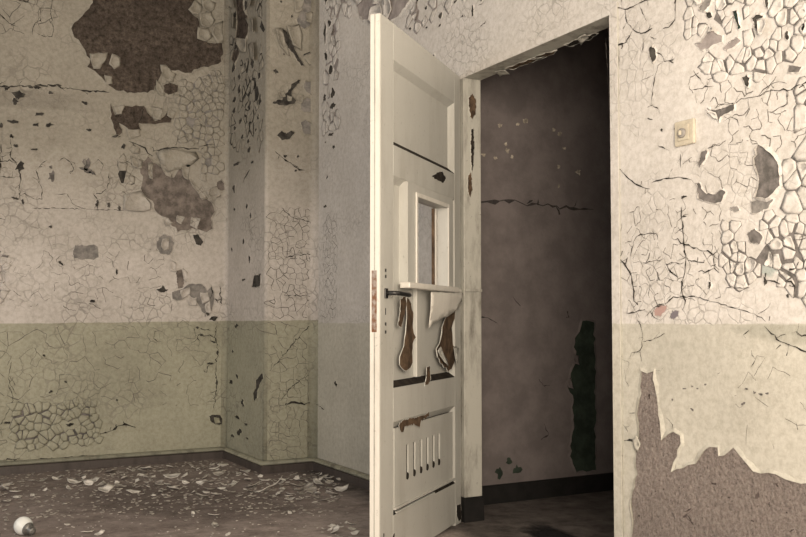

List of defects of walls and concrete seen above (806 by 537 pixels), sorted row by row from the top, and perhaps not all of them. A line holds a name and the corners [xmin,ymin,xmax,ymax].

crack [0,0,58,37]
crack [0,81,108,95]
flaking render [69,0,265,322]
peeling [272,0,458,150]
peeling [431,171,446,183]
flaking render [467,93,497,197]
crack [481,199,594,215]
crack [605,0,676,120]
crack [620,72,806,408]
peeling [683,0,806,307]
crack [0,249,219,461]
flaking render [629,367,806,537]